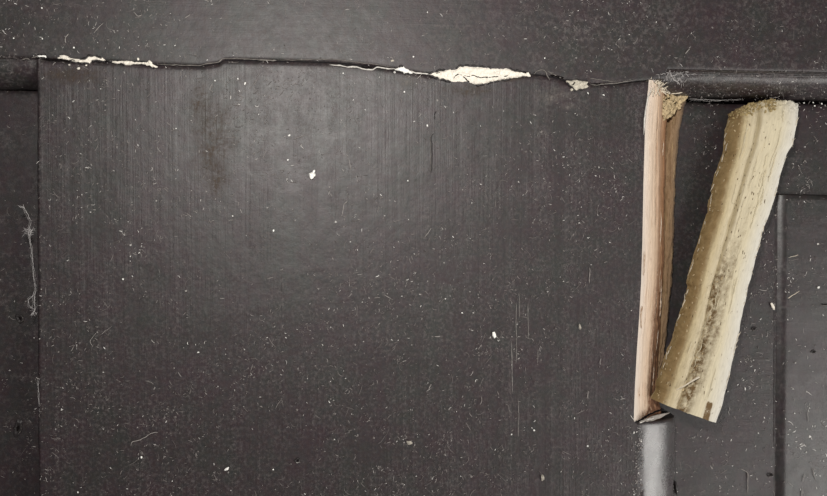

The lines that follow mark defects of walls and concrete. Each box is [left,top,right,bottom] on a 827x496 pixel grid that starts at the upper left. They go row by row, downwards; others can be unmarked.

crack [22,55,71,63]
crack [158,58,428,75]
peeling [428,64,531,87]
crack [521,69,565,80]
crack [589,78,633,86]